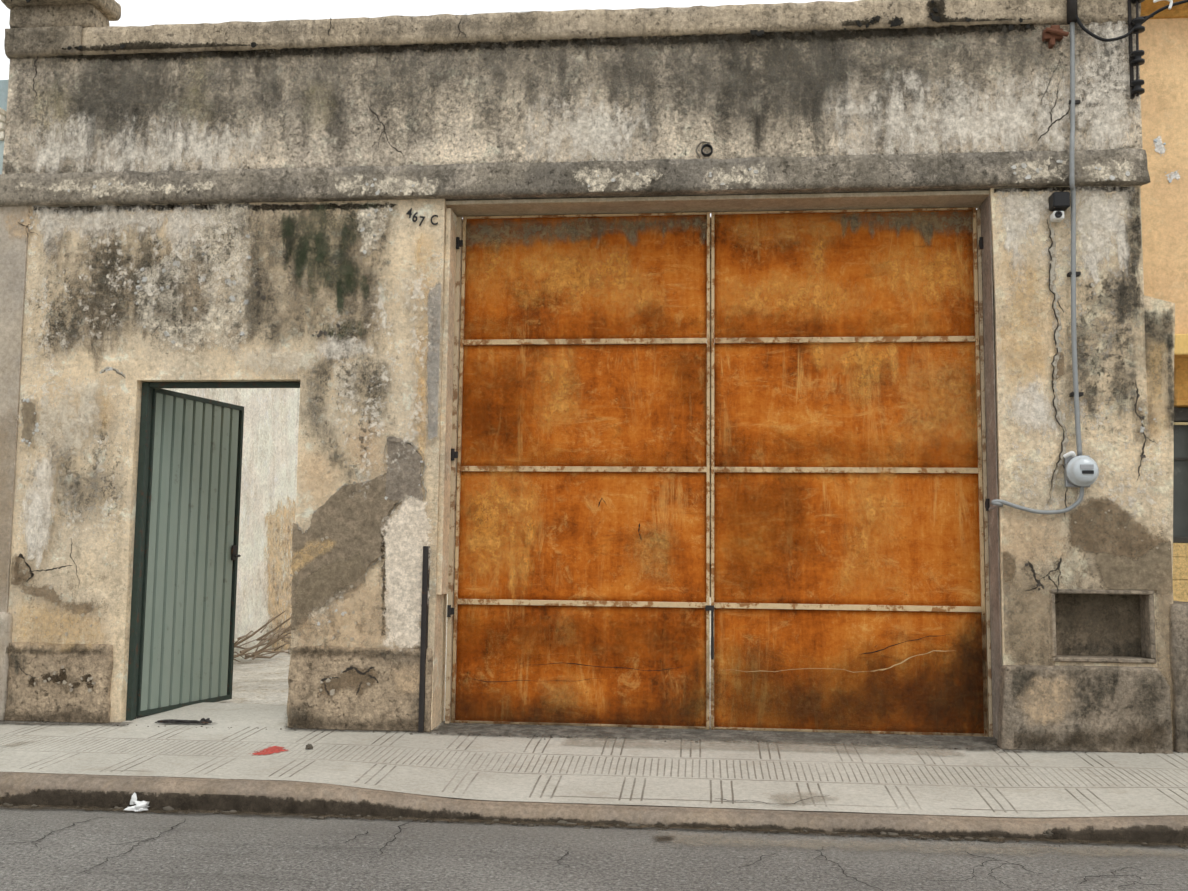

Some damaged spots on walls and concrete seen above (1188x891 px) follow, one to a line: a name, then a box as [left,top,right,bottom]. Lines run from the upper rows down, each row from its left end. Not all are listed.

crack [1038,56,1070,140]
crack [1046,219,1069,515]
crack [1134,380,1156,480]
spalling [11,553,34,585]
damp [292,551,380,649]
peeling [265,440,423,651]
rust [469,482,533,585]
crack [1025,557,1062,593]
damp [1002,497,1173,595]
spalling [28,665,96,692]
spalling [319,667,378,696]